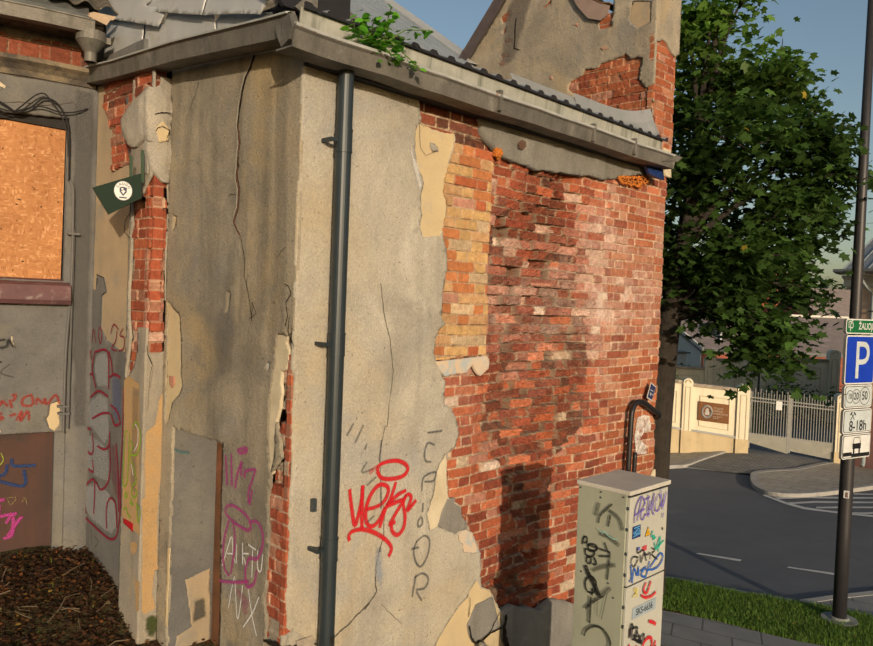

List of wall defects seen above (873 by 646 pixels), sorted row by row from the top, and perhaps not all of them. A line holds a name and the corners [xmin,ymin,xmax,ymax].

flaking render [0,31,87,67]
flaking render [93,77,135,352]
peeling [122,303,182,626]
crack [229,55,256,322]
crack [285,284,294,346]
spalling [263,335,318,646]
crack [335,286,396,637]
spalling [415,102,671,646]
spalling [569,54,648,111]